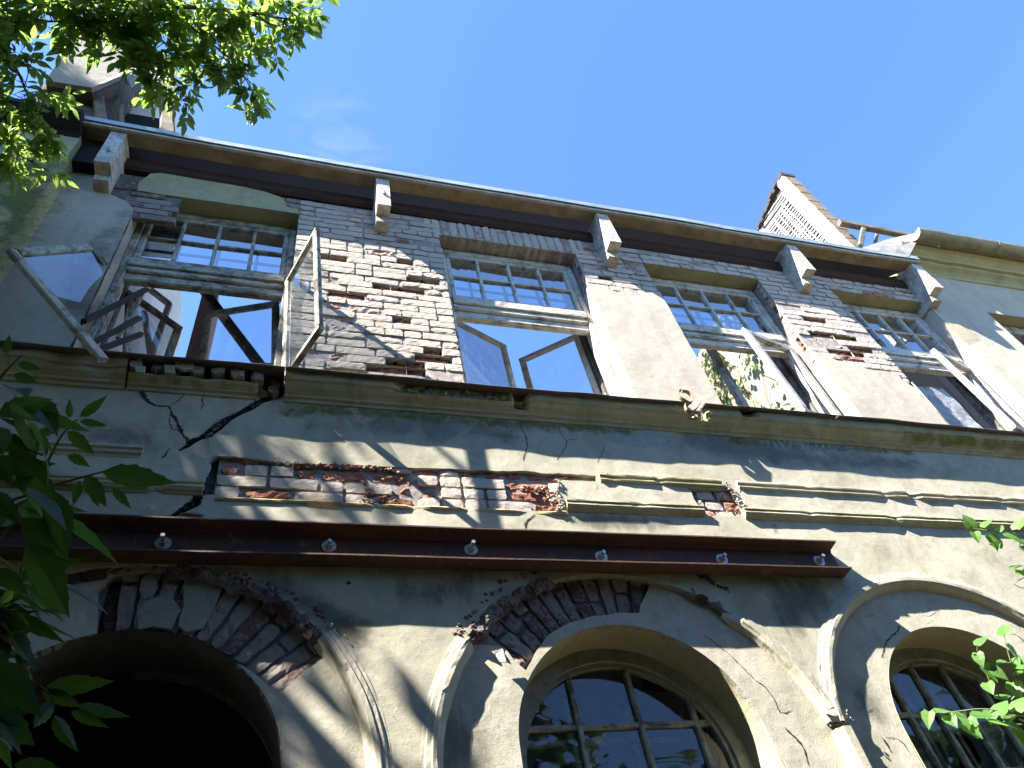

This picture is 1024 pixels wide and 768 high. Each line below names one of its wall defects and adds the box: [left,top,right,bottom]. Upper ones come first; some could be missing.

flaking render [110,174,183,228]
flaking render [281,197,464,382]
flaking render [573,240,920,384]
crack [139,387,285,517]
flaking render [213,454,595,512]
flaking render [692,482,745,516]
flaking render [67,564,346,691]
flaking render [452,571,644,669]